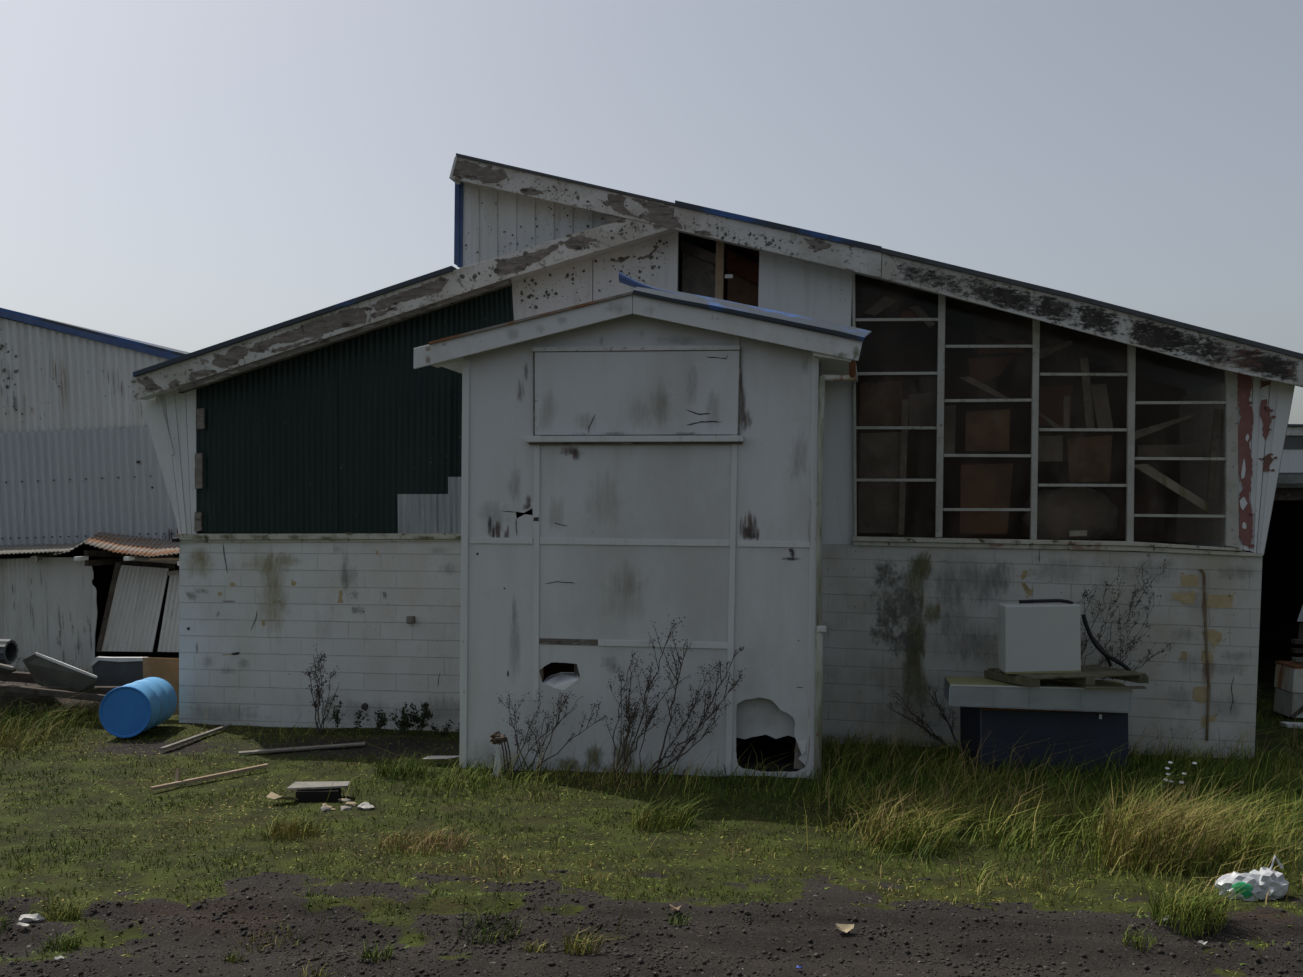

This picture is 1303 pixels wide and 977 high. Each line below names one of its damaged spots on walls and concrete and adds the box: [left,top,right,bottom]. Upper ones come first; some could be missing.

peeling [453,160,543,197]
peeling [604,193,712,236]
peeling [493,232,595,276]
peeling [613,245,659,263]
peeling [369,277,449,318]
peeling [1237,353,1278,548]
water stain [905,555,939,699]